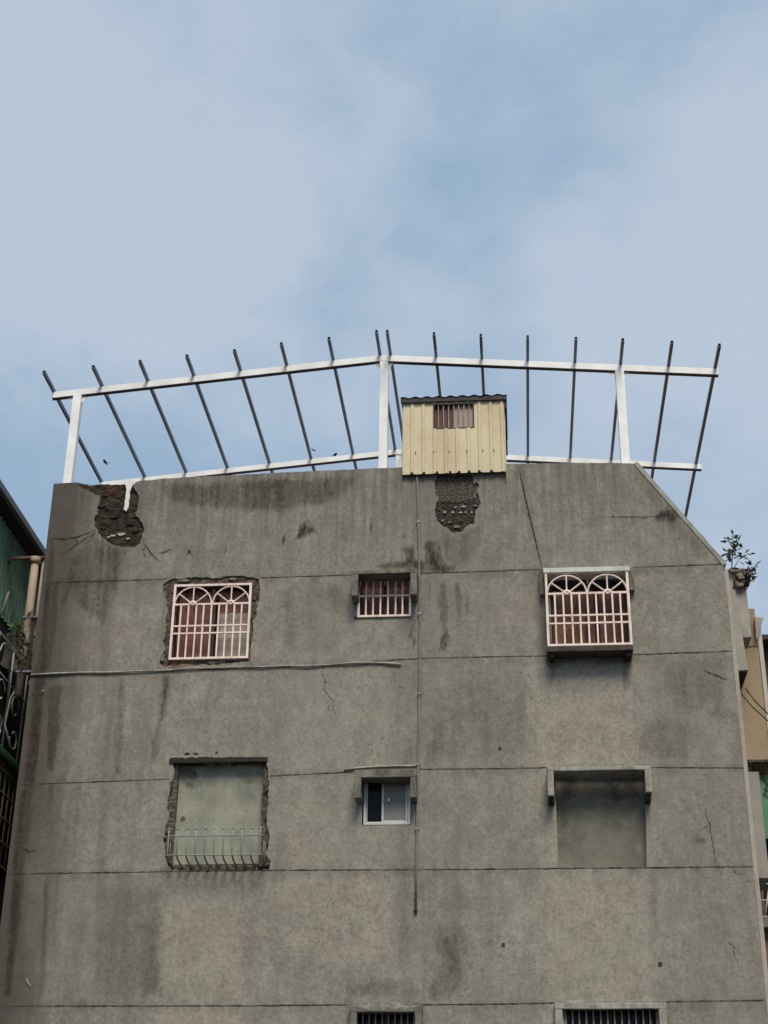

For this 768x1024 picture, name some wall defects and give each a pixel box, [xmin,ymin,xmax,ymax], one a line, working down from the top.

crack [49,530,95,550]
spalling [78,481,144,547]
spalling [435,475,481,533]
flaking render [160,576,260,667]
flaking render [164,753,271,871]